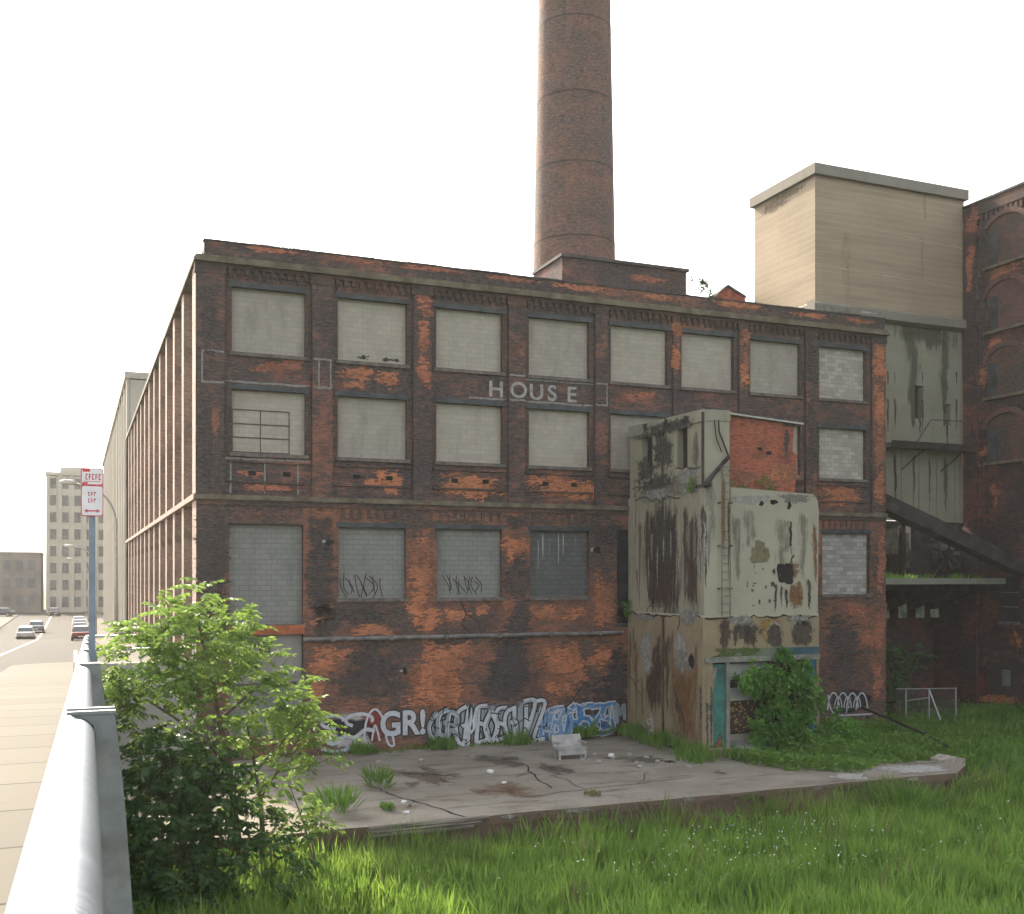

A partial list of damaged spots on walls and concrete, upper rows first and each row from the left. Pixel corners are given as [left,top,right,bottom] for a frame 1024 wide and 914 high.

spalling [964,203,1024,298]
spalling [334,366,401,391]
spalling [413,295,434,390]
water stain [895,325,958,431]
spalling [498,532,533,563]
water stain [593,415,695,614]
spalling [399,528,514,708]
spalling [531,567,620,629]
spalling [306,623,400,703]
spalling [531,641,614,702]
crack [363,767,466,817]
crack [517,763,688,797]